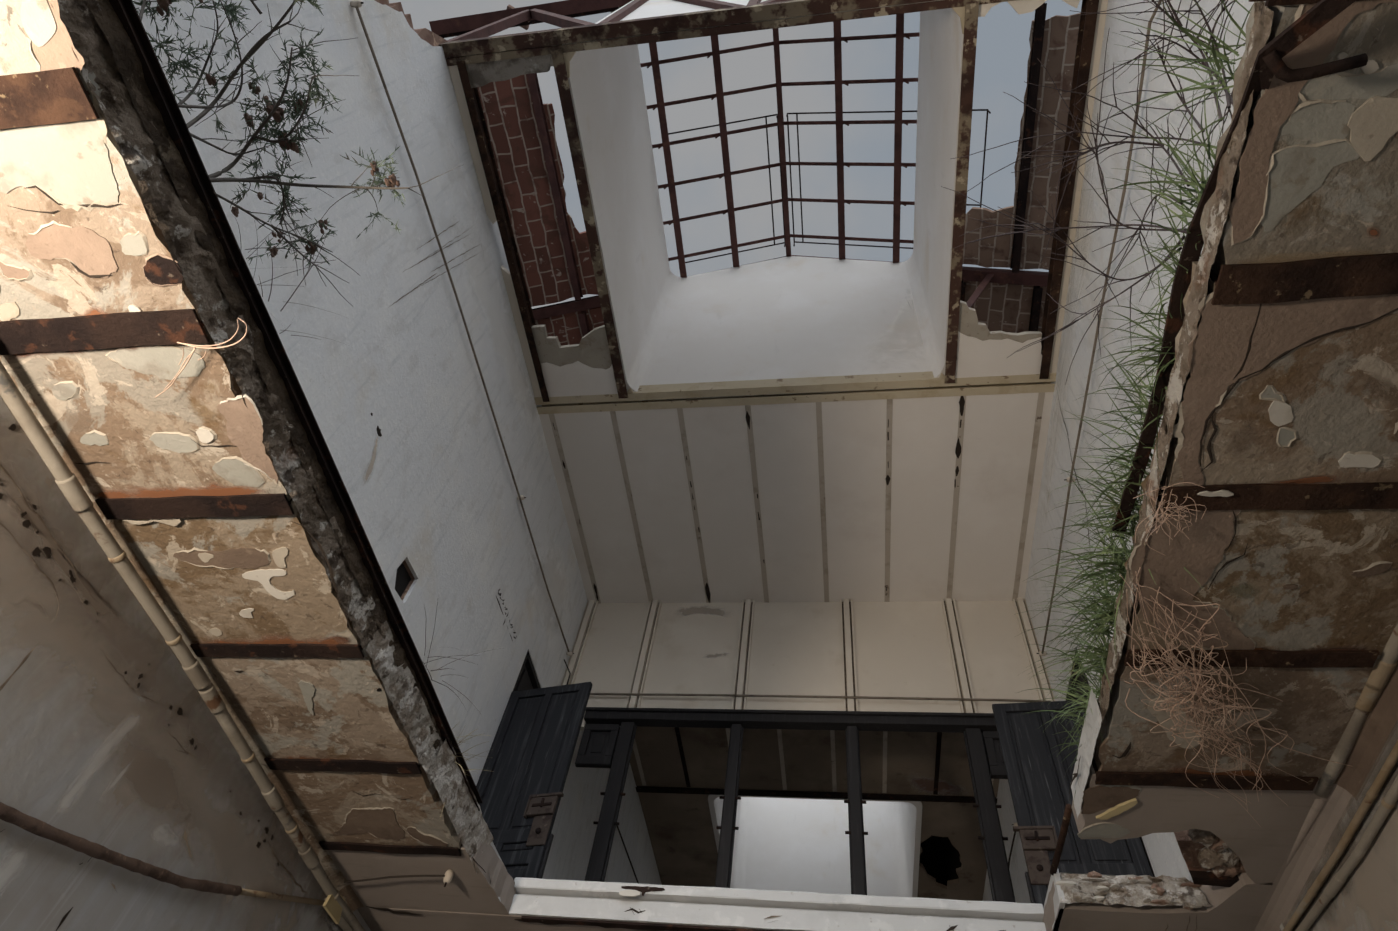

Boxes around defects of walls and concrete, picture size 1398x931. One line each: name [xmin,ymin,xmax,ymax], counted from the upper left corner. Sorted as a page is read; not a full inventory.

peeling [20,0,85,73]
peeling [1228,0,1398,246]
peeling [0,110,184,287]
peeling [0,302,20,321]
peeling [106,345,205,380]
crack [1200,304,1398,472]
peeling [80,429,109,446]
rust [93,484,259,499]
peeling [149,394,279,487]
peeling [1129,292,1398,650]
spalling [20,504,51,559]